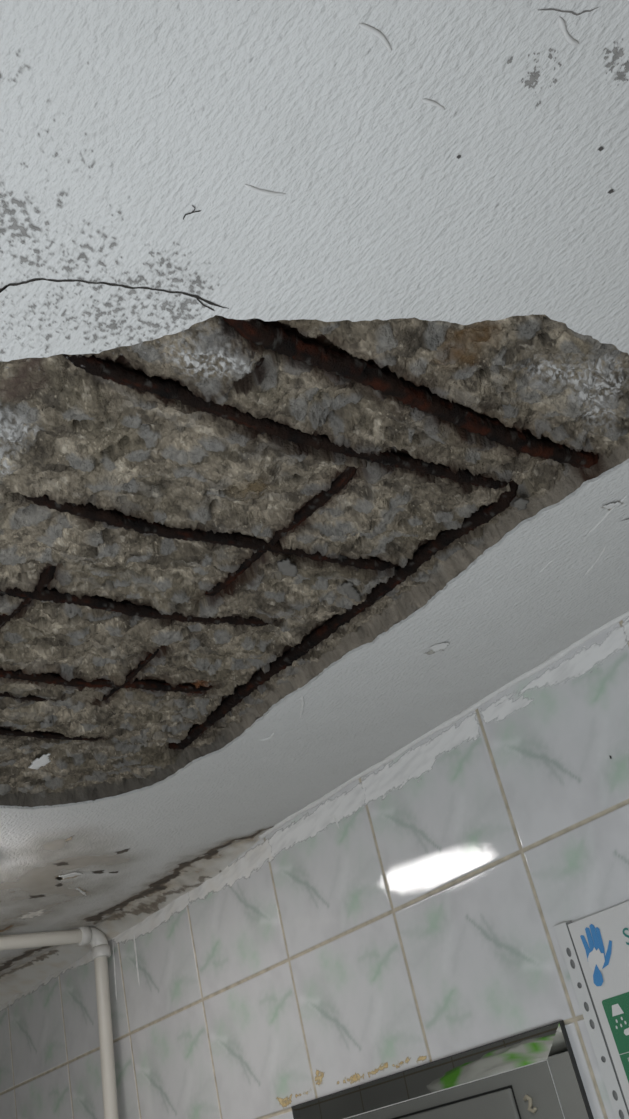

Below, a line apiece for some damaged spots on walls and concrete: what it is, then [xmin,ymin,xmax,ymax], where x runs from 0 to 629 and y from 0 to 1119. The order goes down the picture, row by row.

peeling [521,49,561,88]
peeling [603,39,629,81]
crack [0,278,229,311]
rust [221,316,599,469]
spalling [0,192,629,807]
rust [0,354,519,751]
water stain [83,827,273,925]
water stain [0,946,57,978]